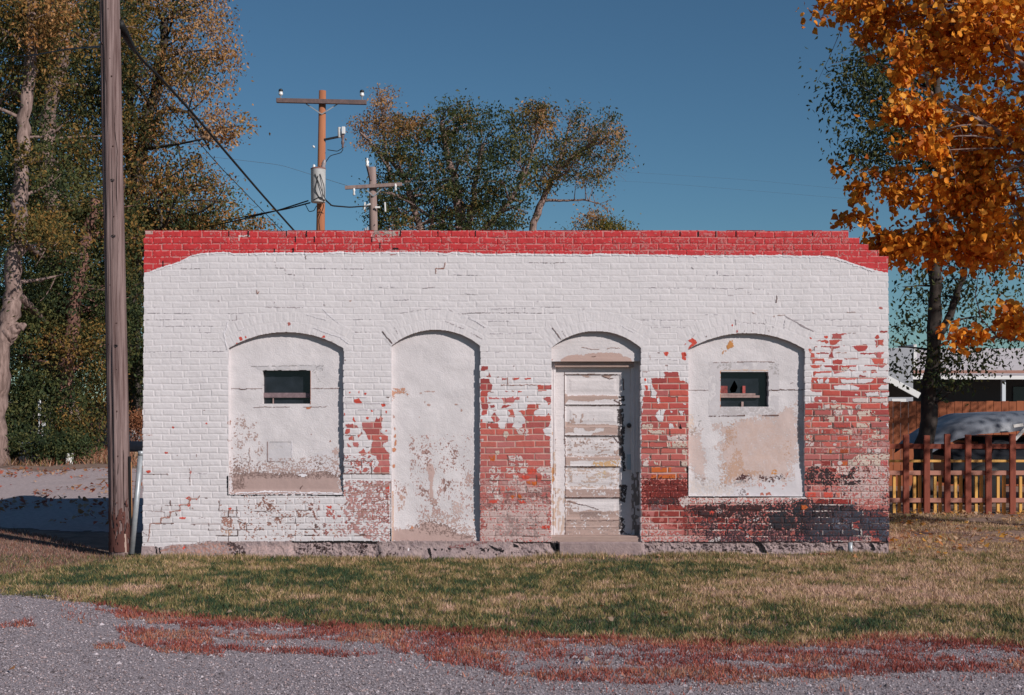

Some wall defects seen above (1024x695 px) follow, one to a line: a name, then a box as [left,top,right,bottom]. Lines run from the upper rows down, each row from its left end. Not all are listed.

flaking render [296,331,890,558]
leakage [641,400,890,542]